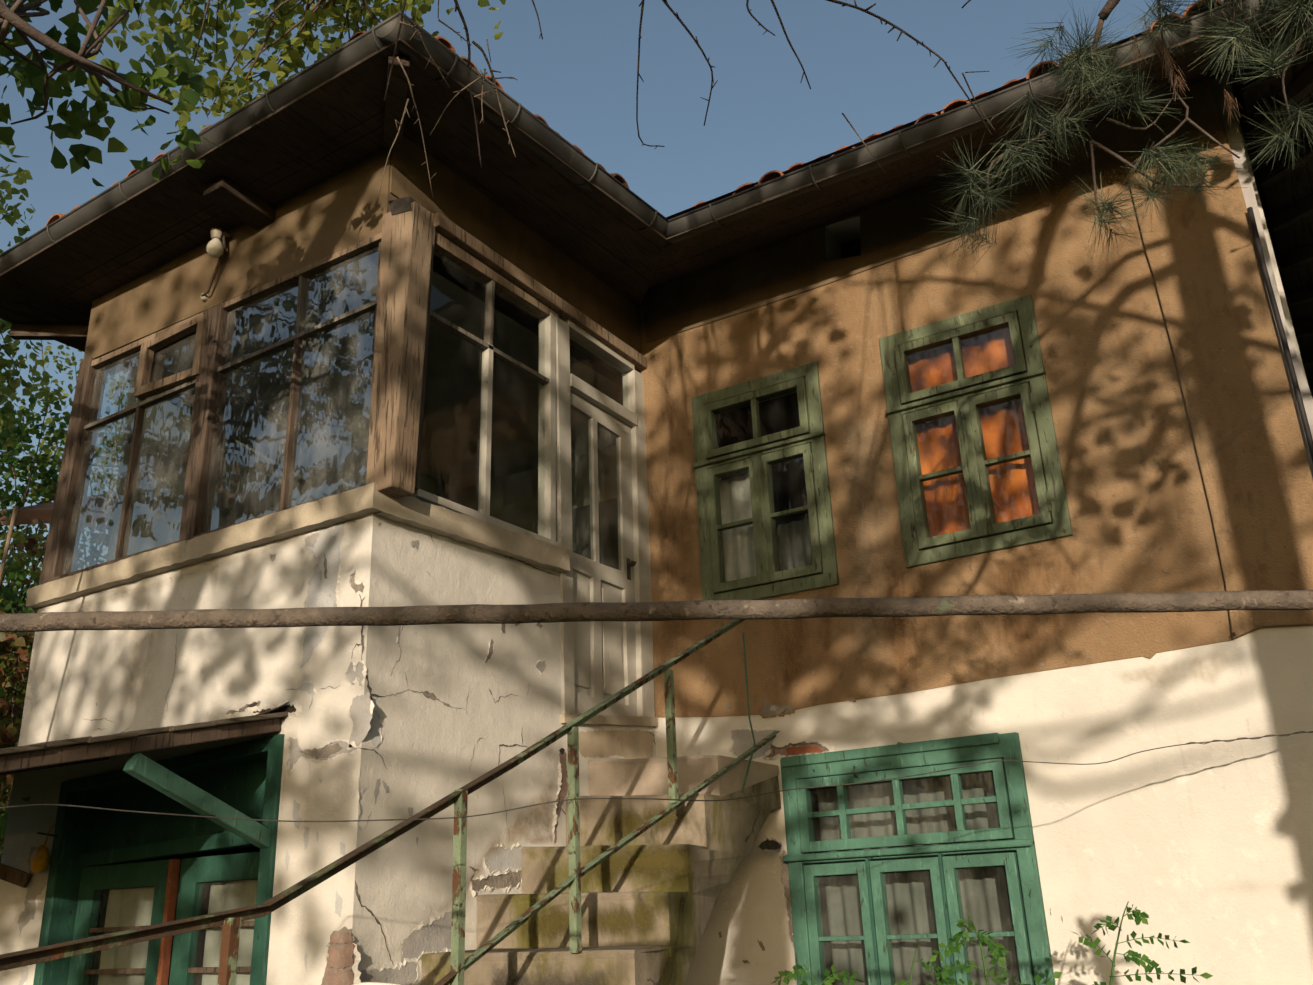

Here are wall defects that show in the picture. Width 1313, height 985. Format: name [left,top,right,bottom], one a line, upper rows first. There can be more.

peeling [303,523,364,608]
peeling [224,626,328,719]
flaking render [286,660,382,783]
crack [286,594,529,837]
flaking render [729,698,834,762]
peeling [469,842,524,898]
crack [355,881,393,963]
flaking render [321,891,452,985]